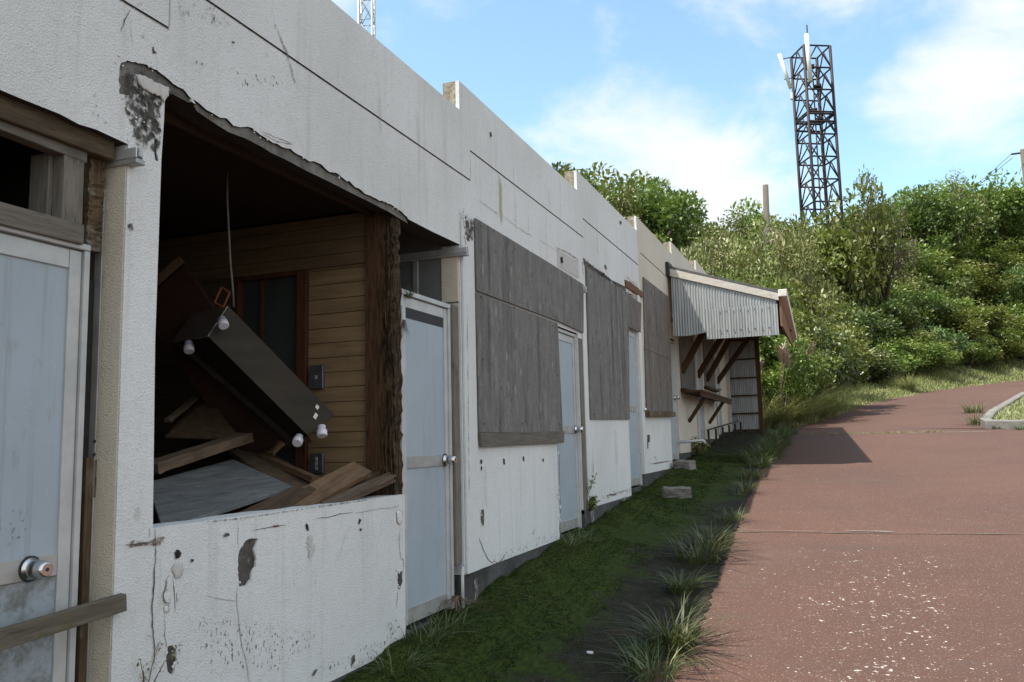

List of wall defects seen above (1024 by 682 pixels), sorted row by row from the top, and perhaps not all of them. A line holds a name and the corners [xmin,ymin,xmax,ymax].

spalling [115,47,407,223]
corrosion [126,537,164,547]
crack [148,535,156,662]
spalling [237,537,256,587]